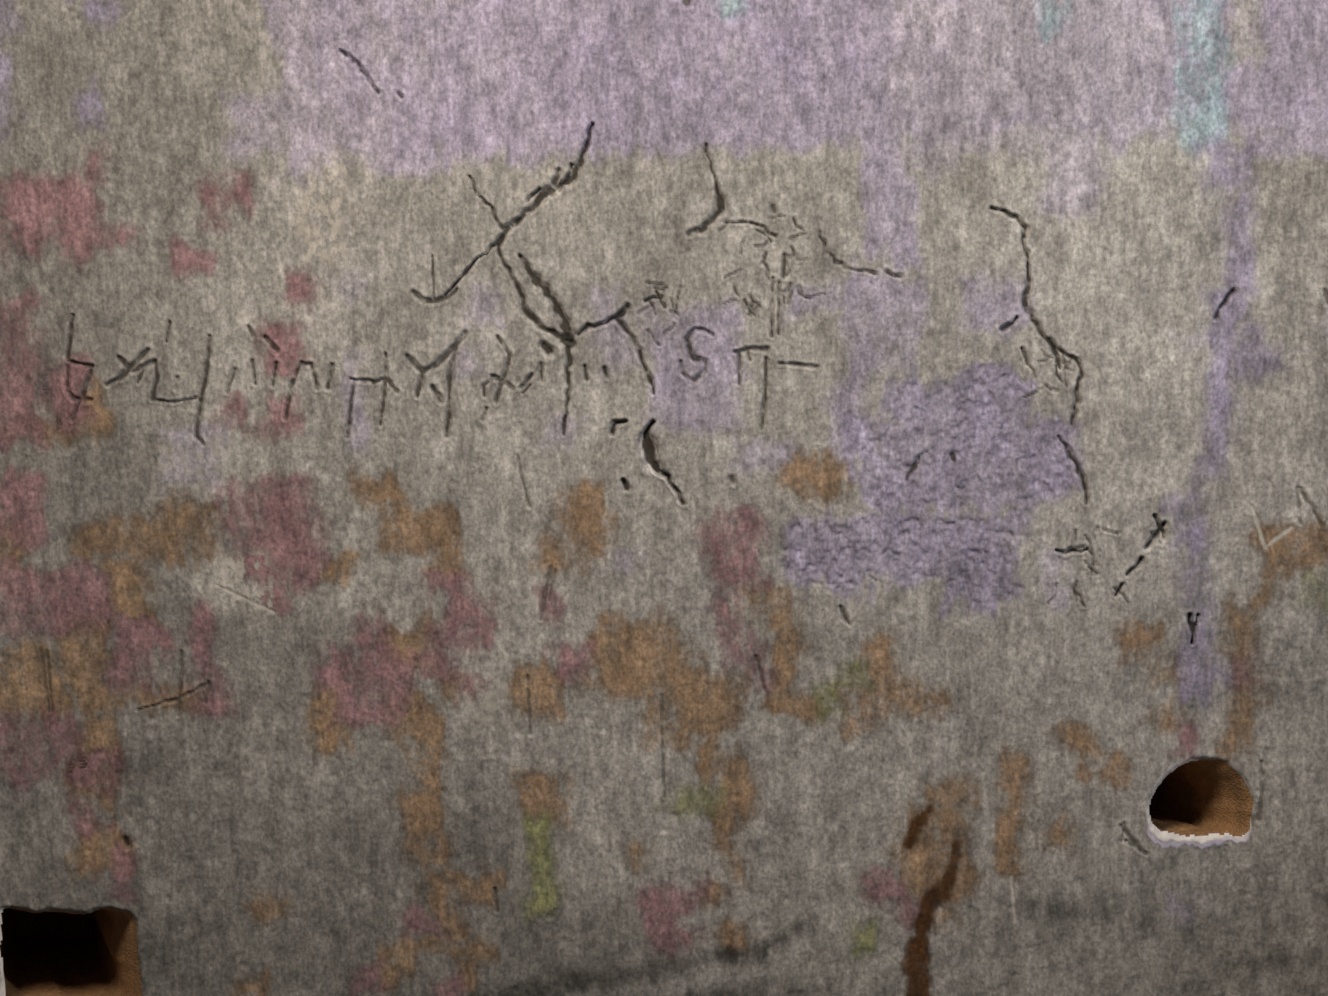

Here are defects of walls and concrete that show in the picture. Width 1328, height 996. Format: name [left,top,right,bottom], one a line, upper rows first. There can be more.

crack [448,130,684,505]
crack [688,147,901,310]
crack [991,207,1165,603]
hole [0,907,142,996]
corrosion [900,781,978,996]
hole [1146,758,1253,849]